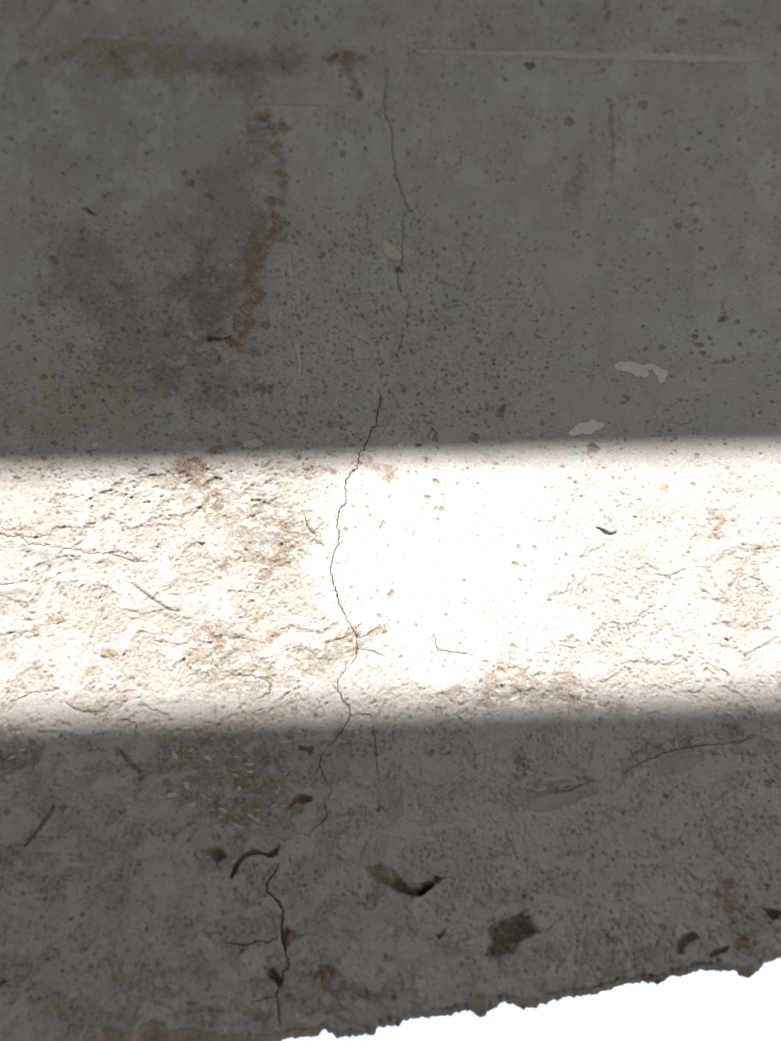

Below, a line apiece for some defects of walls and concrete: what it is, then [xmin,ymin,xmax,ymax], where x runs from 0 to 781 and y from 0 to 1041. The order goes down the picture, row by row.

crack [378,77,409,352]
crack [302,391,387,834]
spalling [86,952,781,1041]